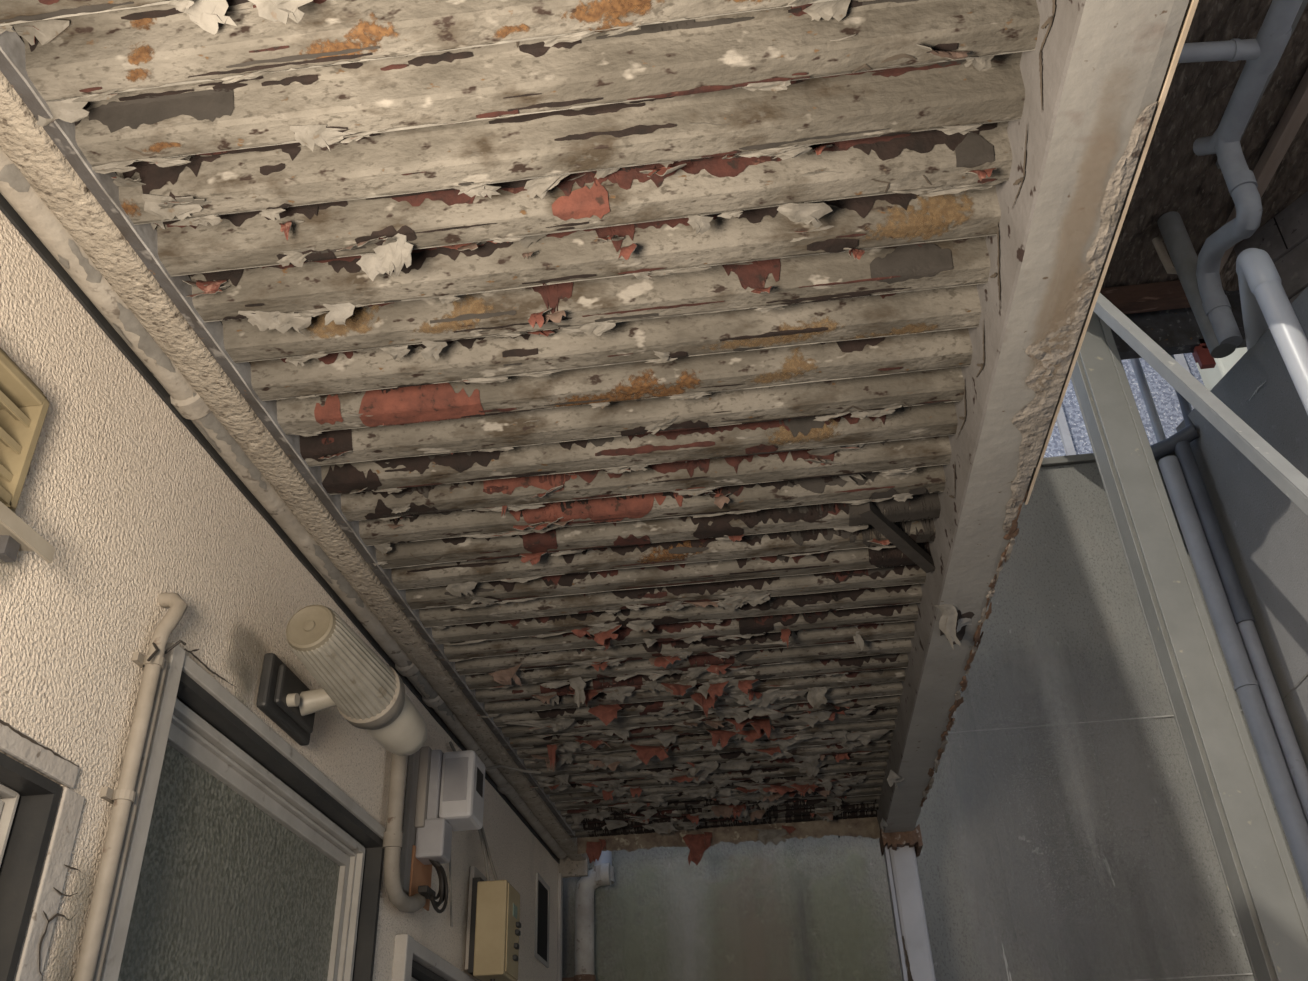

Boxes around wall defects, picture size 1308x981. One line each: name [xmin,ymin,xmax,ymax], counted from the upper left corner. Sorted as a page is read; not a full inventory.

rust [299,13,397,59]
rust [561,0,664,32]
peeling [519,17,753,57]
peeling [788,0,918,21]
peeling [26,46,380,133]
peeling [380,52,473,71]
peeling [476,43,1012,124]
peeling [58,239,102,283]
rust [551,369,700,407]
peeling [92,123,1004,865]
rust [920,490,1028,807]
crack [39,864,81,981]